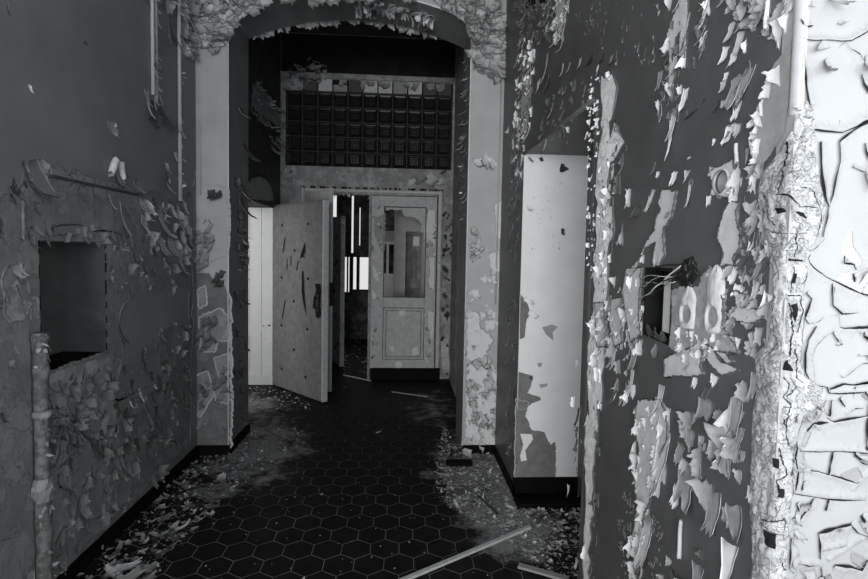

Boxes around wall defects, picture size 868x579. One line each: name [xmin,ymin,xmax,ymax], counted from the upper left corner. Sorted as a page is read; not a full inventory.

flaking render [0,161,260,579]
peeling [143,0,296,61]
flaking render [239,79,289,155]
spalling [253,0,832,579]
crack [786,19,868,579]
peeling [840,453,868,484]